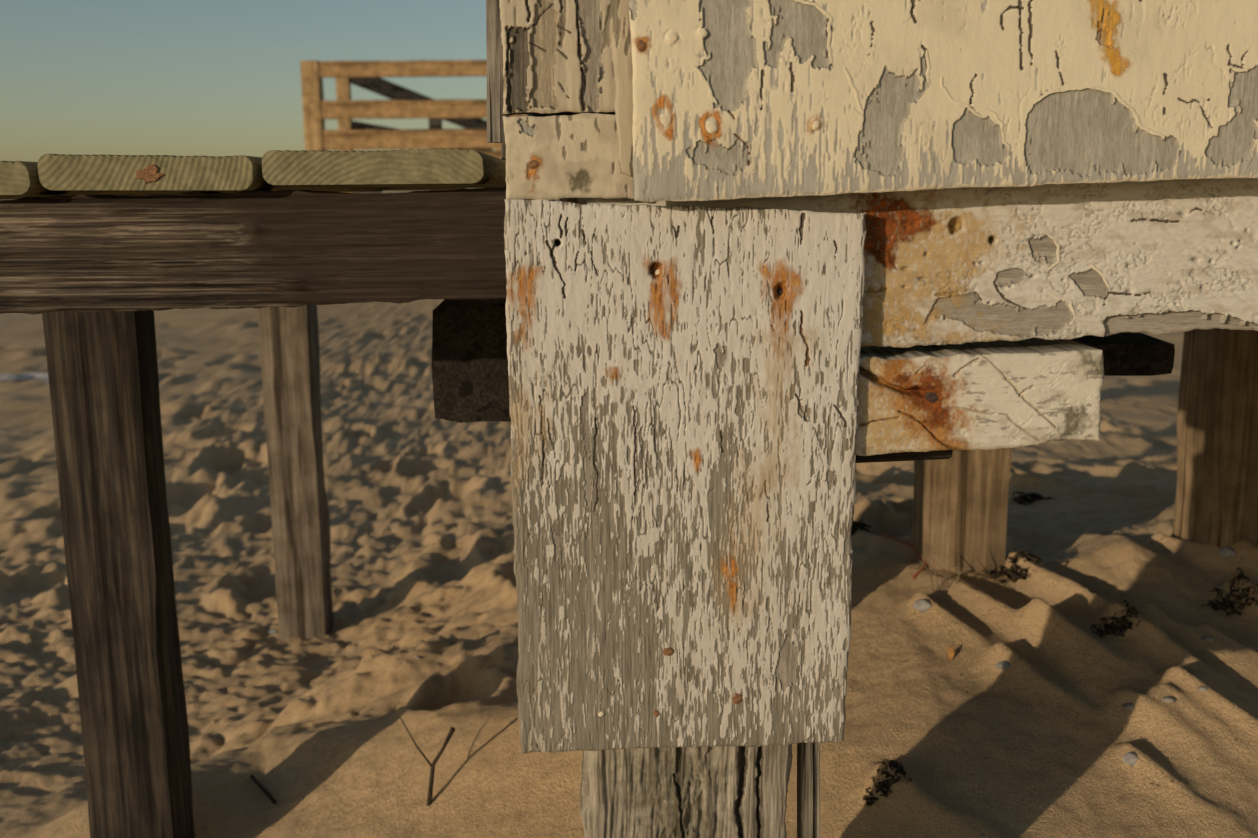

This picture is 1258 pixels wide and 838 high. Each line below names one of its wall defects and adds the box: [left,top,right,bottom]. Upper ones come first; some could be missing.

rust [699,111,721,144]
peeling [686,0,1182,177]
peeling [1205,62,1258,168]
rust [857,193,935,269]
rust [646,262,678,339]
rust [760,264,800,333]
peeling [795,393,811,420]
rust [878,359,966,450]
peeling [825,470,837,490]
peeling [844,532,852,558]
crack [673,773,685,838]
crack [736,746,764,838]